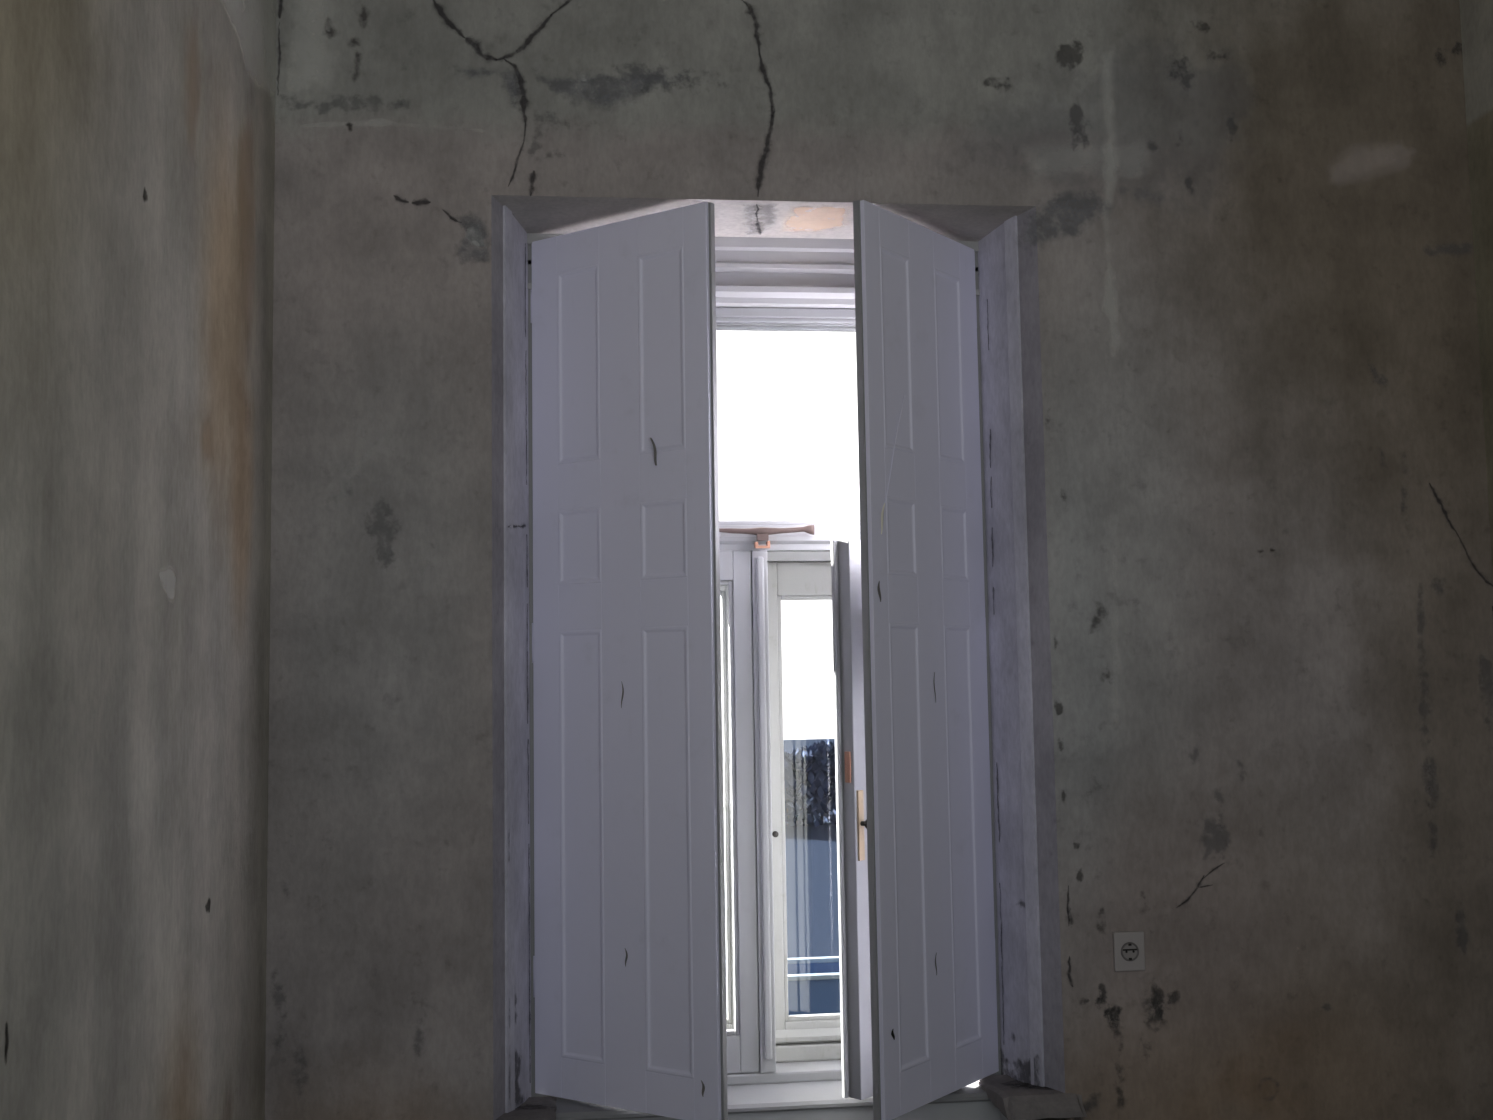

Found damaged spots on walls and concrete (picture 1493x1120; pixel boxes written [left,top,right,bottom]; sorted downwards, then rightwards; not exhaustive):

crack [433,0,570,196]
crack [742,0,775,235]
crack [1429,483,1493,611]